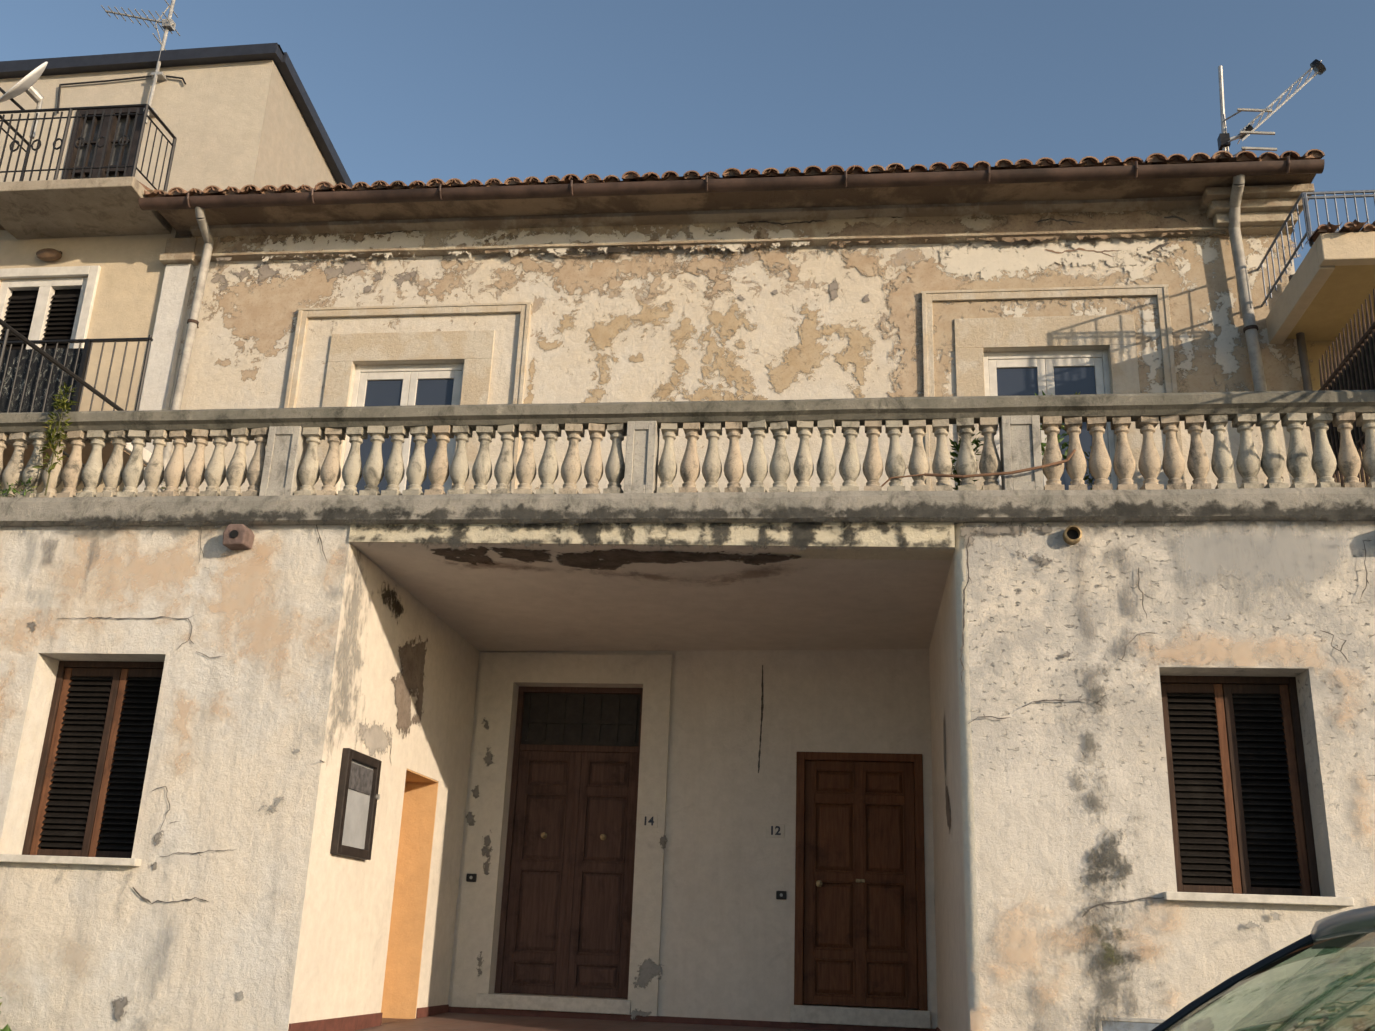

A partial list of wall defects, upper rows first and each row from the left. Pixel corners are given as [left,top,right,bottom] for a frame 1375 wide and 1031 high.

peeling [202,223,1315,404]
damp [578,523,600,545]
damp [619,523,634,542]
damp [709,523,731,544]
damp [759,523,771,545]
damp [790,522,821,549]
crack [59,615,223,658]
peeling [391,635,428,738]
crack [152,786,237,857]
crack [132,887,209,904]
damp [1052,731,1153,1031]
spalling [633,959,662,988]